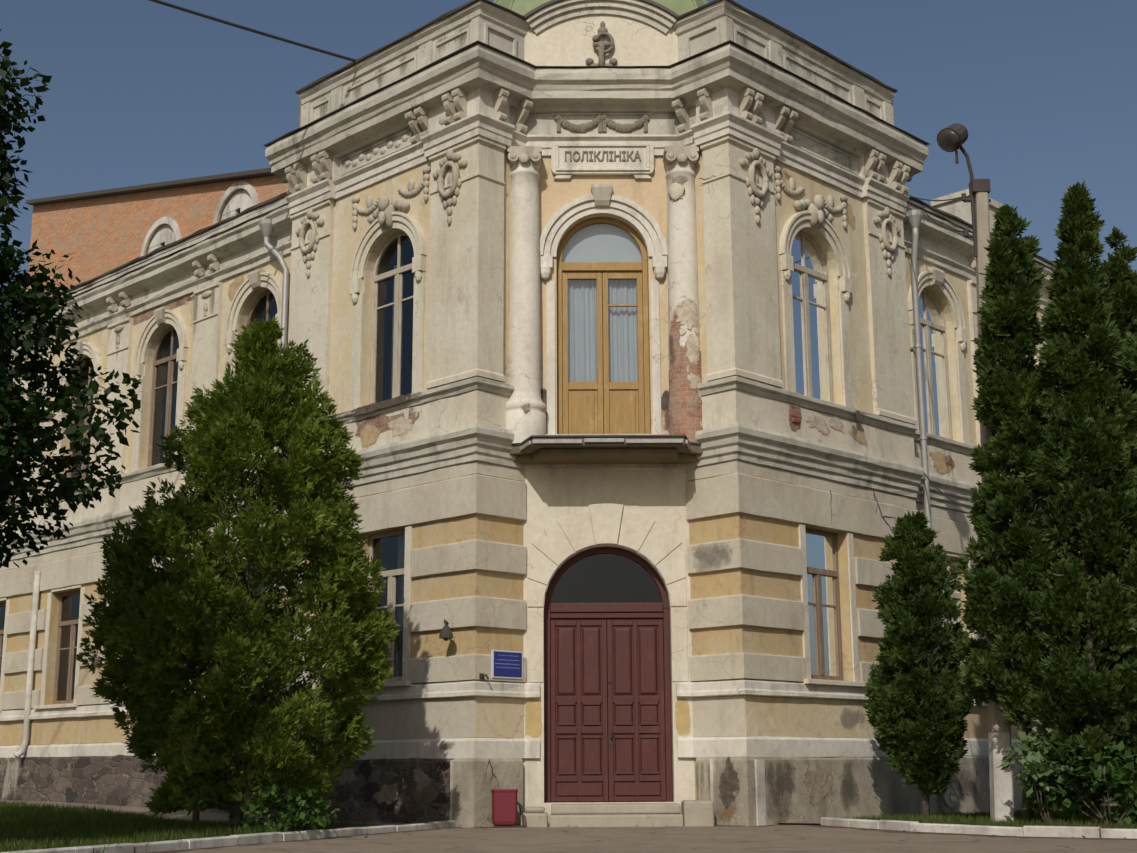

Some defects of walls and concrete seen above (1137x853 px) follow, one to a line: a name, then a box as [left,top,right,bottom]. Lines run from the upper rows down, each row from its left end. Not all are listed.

flaking render [668,298,703,443]
flaking render [355,407,422,448]
flaking render [789,404,867,445]
leakage [696,546,729,570]
leakage [841,764,875,801]